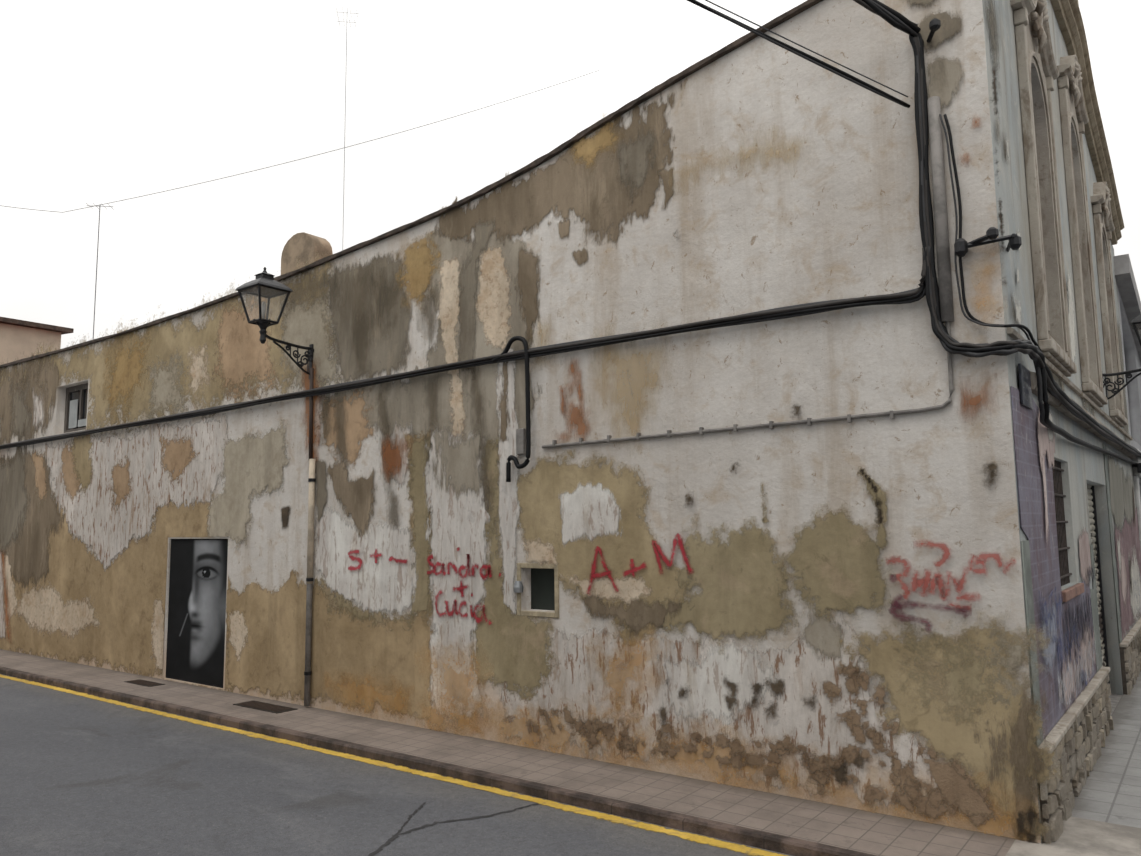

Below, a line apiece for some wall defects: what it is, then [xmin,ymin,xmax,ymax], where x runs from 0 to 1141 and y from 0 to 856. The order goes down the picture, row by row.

flaking render [434,84,682,265]
water stain [0,360,64,638]
flaking render [0,255,345,677]
flaking render [200,431,433,721]
corrosion [560,362,587,440]
peeling [501,450,938,812]
peeling [1038,411,1055,537]
peeling [1067,274,1076,362]
peeling [1117,536,1141,619]